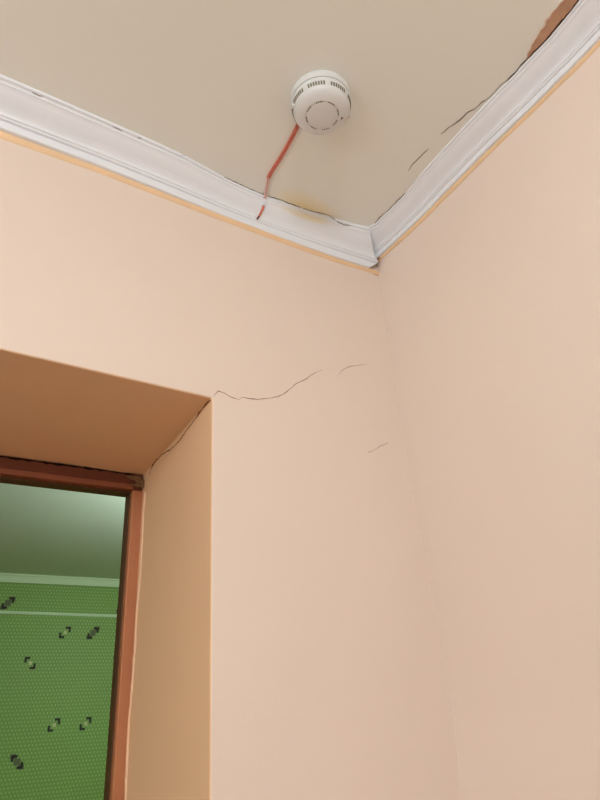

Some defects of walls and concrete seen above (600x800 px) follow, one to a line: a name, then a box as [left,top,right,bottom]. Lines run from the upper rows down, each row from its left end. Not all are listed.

spalling [527,0,579,59]
crack [441,59,527,134]
crack [225,177,350,226]
crack [0,371,318,475]